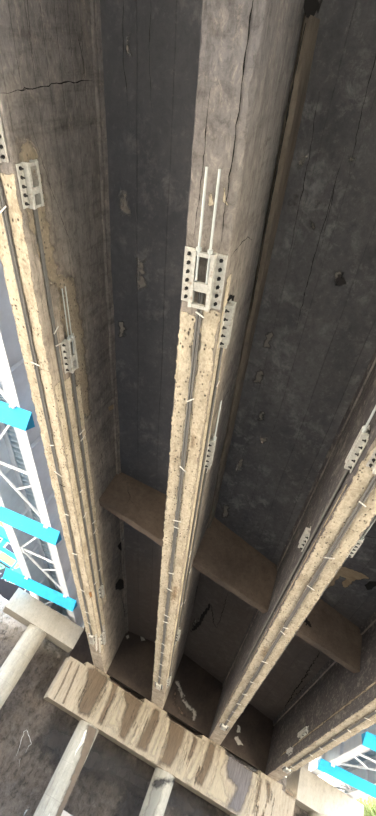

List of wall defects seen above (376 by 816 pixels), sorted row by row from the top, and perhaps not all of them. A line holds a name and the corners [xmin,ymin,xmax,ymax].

crack [7,0,92,254]
crack [193,94,210,238]
crack [221,2,306,320]
spalling [304,0,319,18]
spalling [217,446,376,727]
leakage [48,662,275,816]